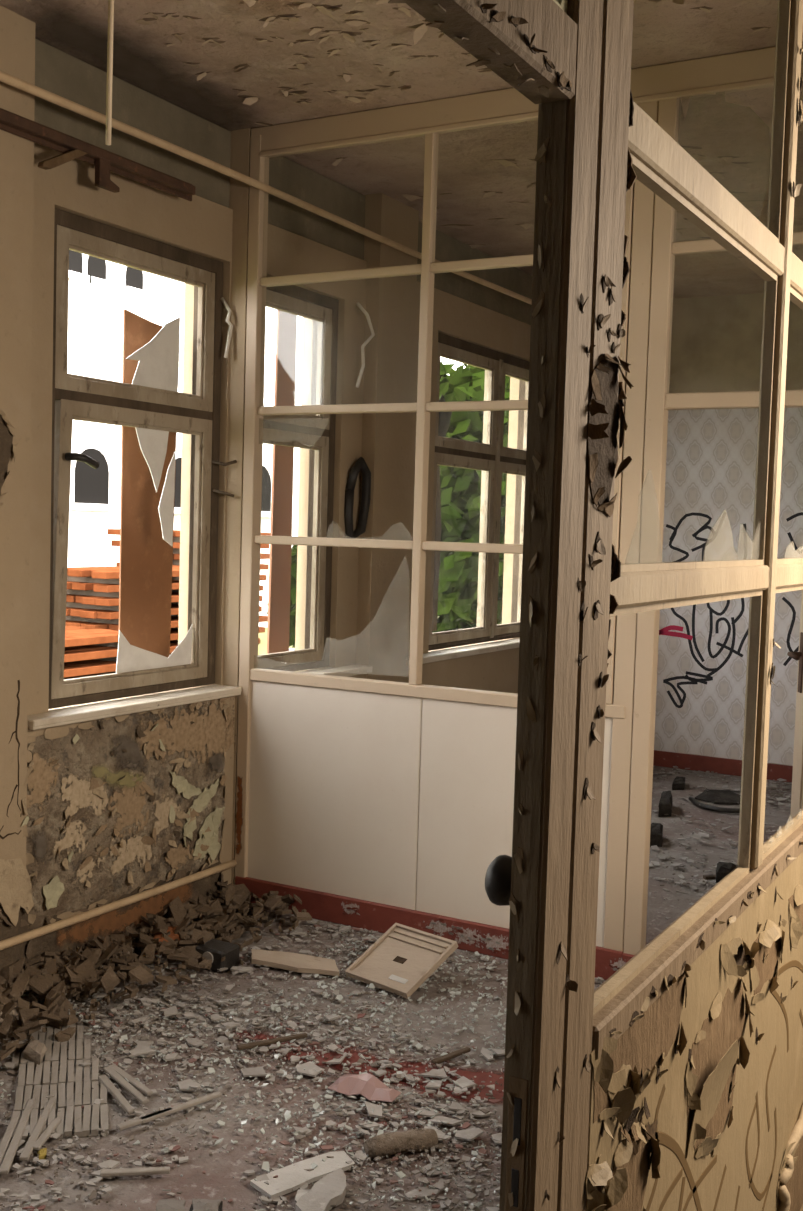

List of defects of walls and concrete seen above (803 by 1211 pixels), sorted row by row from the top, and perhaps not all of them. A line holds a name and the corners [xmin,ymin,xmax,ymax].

peeling [255,0,572,106]
peeling [232,89,259,105]
peeling [626,148,637,192]
spalling [0,409,18,508]
peeling [577,532,621,688]
peeling [591,705,604,743]
peeling [583,778,596,800]
spalling [0,697,236,971]
peeling [423,919,519,963]
peeling [556,942,578,992]
peeling [583,841,803,1211]
peeling [553,1066,561,1091]